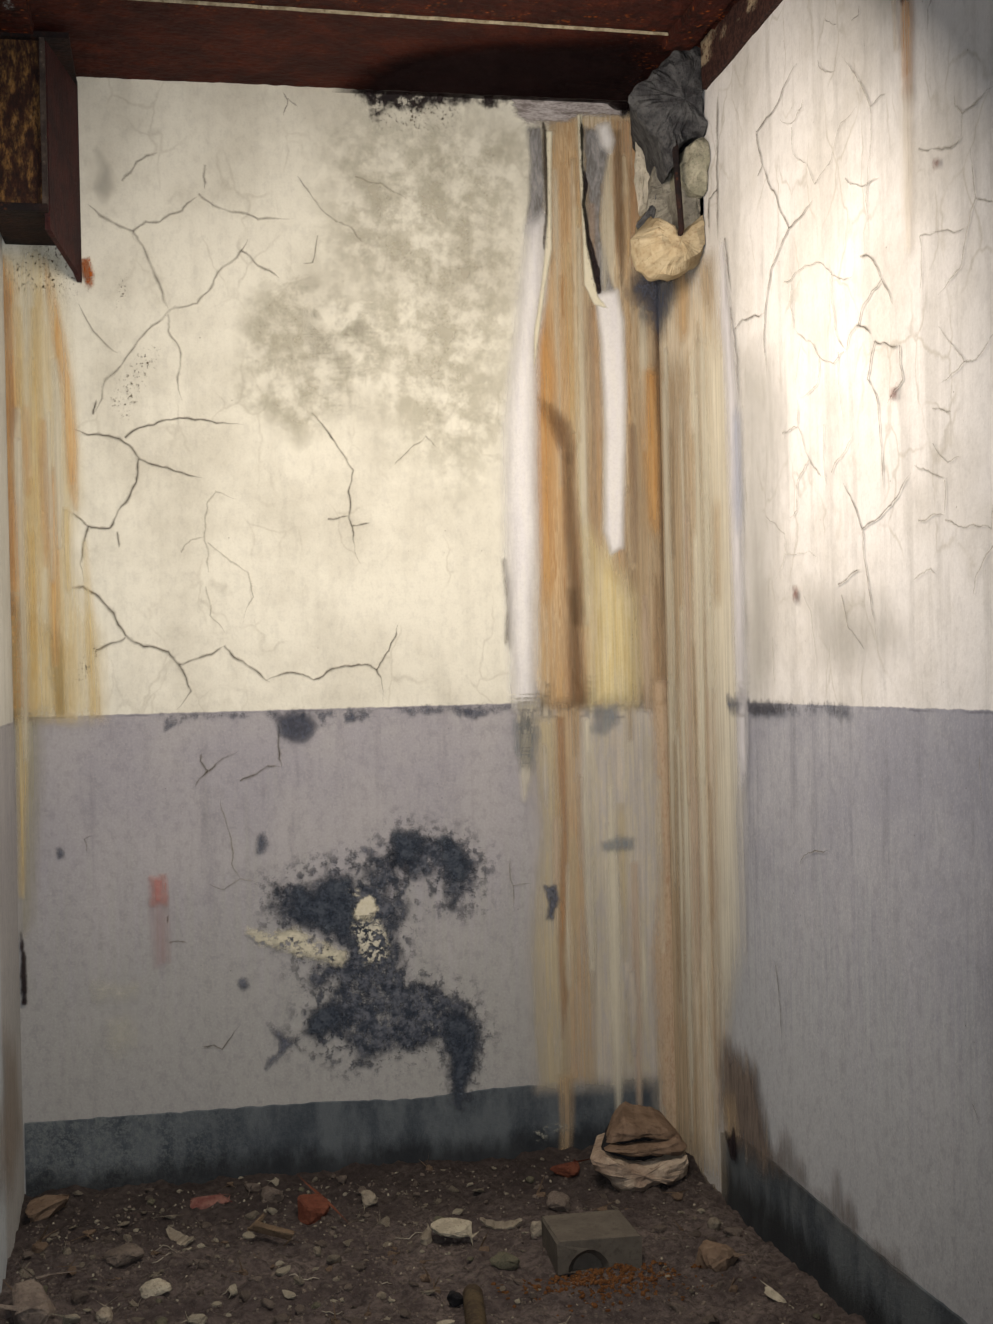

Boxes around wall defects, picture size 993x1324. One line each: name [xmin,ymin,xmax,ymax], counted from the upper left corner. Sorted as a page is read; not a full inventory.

spalling [628,46,710,283]
crack [730,79,903,429]
crack [918,147,990,287]
rust [5,257,93,718]
crack [64,179,397,695]
rust [532,110,736,1165]
crack [782,419,993,641]
damp [248,830,489,1108]
damp [723,1045,781,1169]